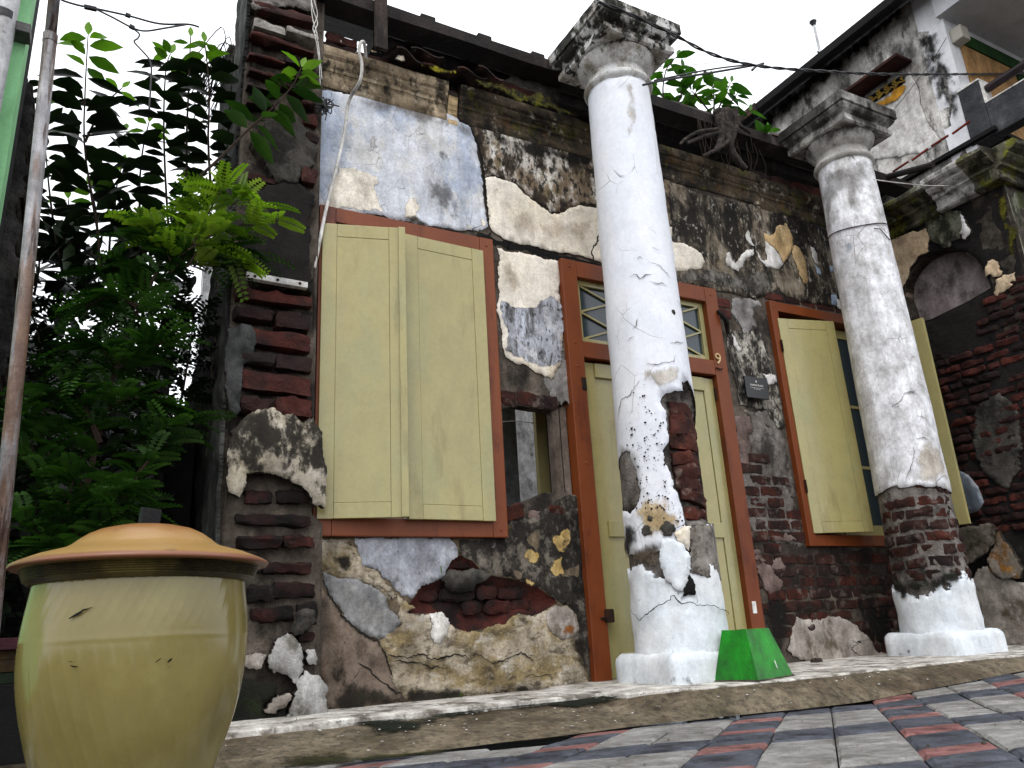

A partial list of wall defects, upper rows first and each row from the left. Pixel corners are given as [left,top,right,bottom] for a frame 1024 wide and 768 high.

leakage [920,34,958,114]
leakage [497,136,590,165]
peeling [725,223,834,284]
spalling [619,451,641,514]
spalling [641,401,721,591]
flaking render [741,259,1024,654]
crack [323,580,553,694]
spalling [322,537,556,643]
crack [631,595,729,621]